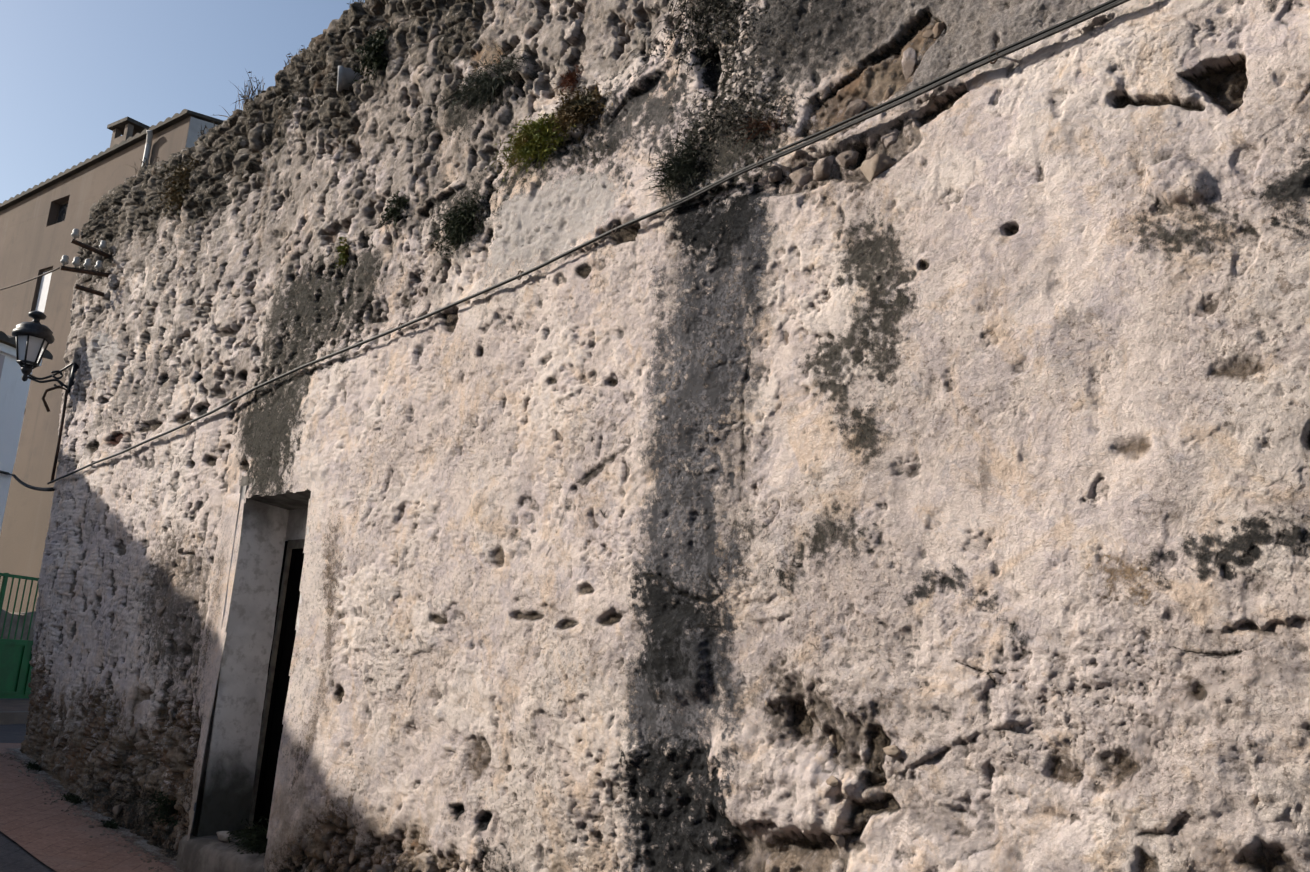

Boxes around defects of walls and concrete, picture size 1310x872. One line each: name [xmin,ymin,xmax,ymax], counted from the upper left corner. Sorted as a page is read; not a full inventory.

flaking render [764,13,946,198]
leakage [1271,207,1310,251]
leakage [229,225,392,500]
leakage [614,0,883,872]
leakage [799,208,919,478]
flaking render [19,521,214,861]
flaking render [753,659,902,816]
flaking render [269,796,519,872]
flaking render [754,830,850,872]